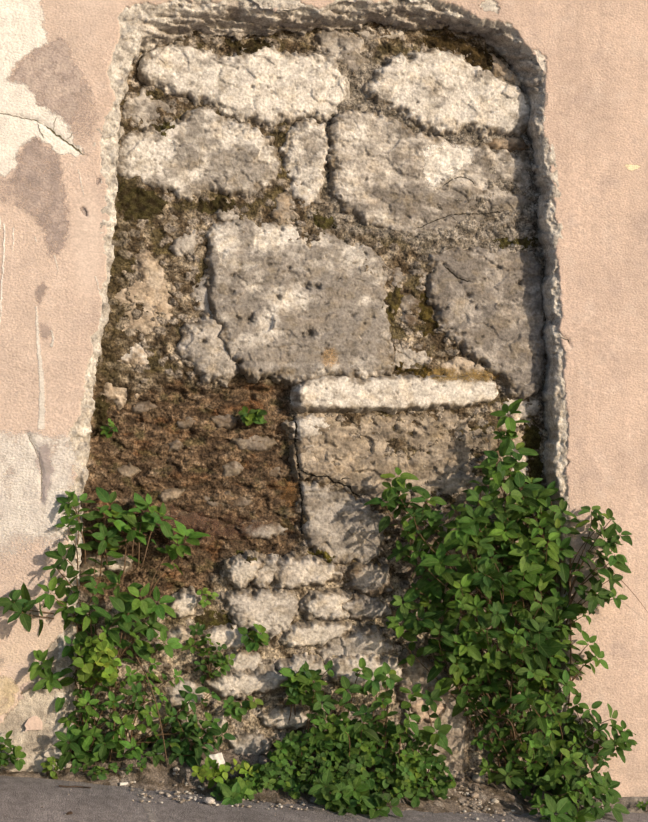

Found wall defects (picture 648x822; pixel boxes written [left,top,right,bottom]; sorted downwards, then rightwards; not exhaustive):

damp [0,137,69,254]
peeling [0,0,84,177]
crack [0,113,85,155]
damp [9,37,96,135]
spalling [65,0,570,542]
crack [417,211,503,228]
crack [290,414,363,541]
spalling [0,525,83,772]